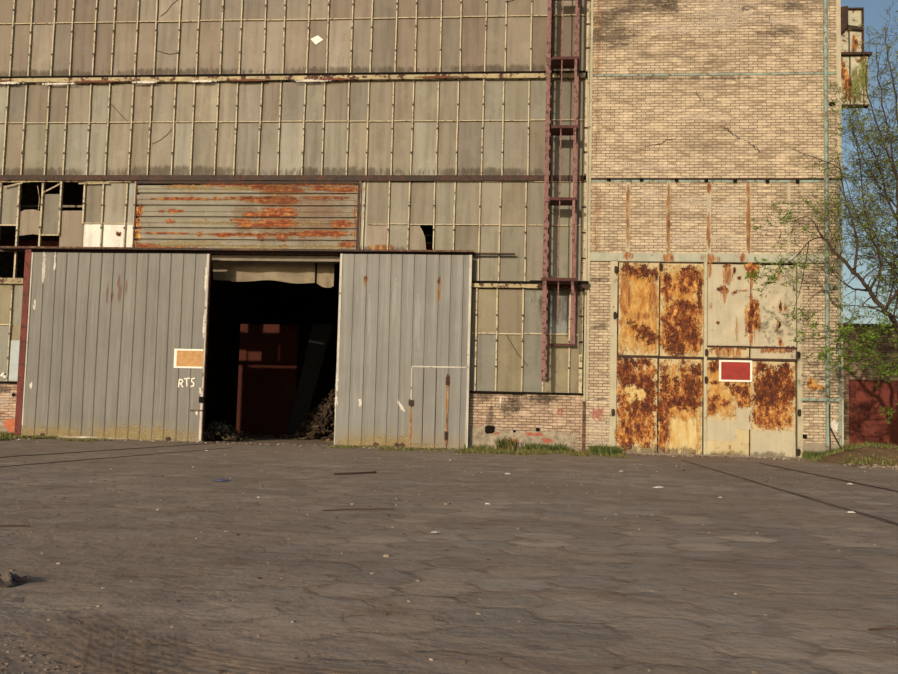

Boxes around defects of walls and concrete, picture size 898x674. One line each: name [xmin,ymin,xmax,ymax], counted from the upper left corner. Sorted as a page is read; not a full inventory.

damp [590,0,686,47]
corrosion [131,184,364,249]
corrosion [614,182,797,453]
corrosion [807,377,825,391]